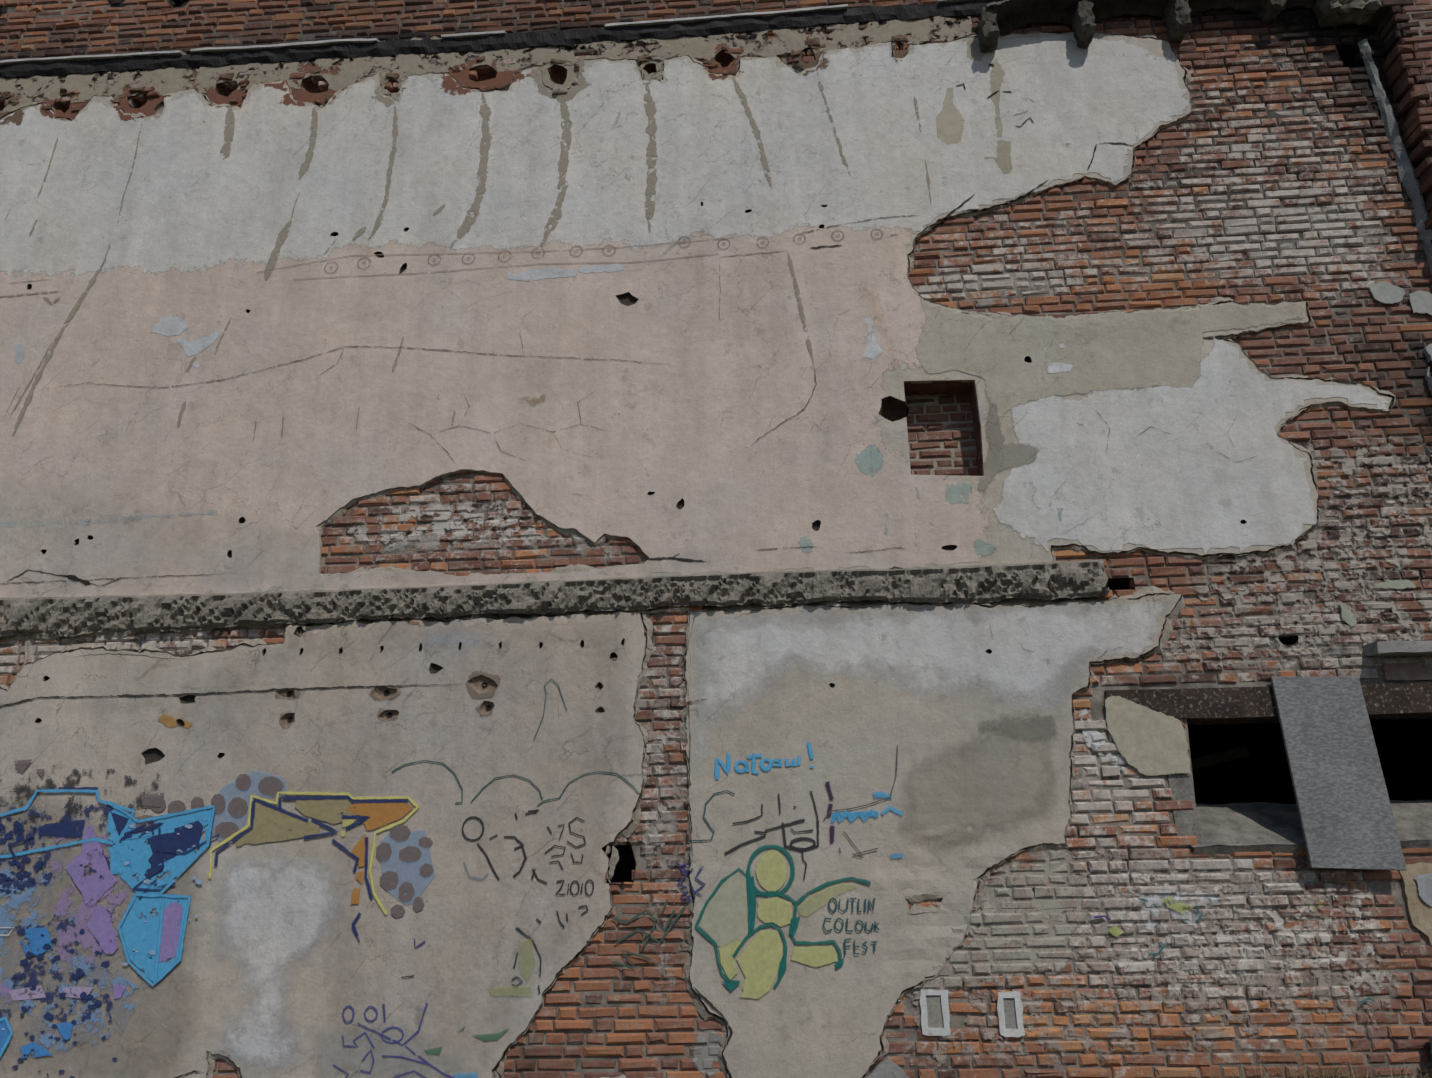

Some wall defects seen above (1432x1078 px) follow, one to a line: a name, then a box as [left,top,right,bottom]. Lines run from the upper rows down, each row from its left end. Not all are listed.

leakage [370,76,408,238]
flaking render [0,0,1013,174]
leakage [440,56,591,247]
leakage [637,61,664,232]
leakage [704,43,772,186]
leakage [793,45,850,174]
spalling [615,292,639,306]
crack [67,337,657,463]
crack [755,372,817,442]
flaking render [317,470,649,577]
peeling [863,7,1432,1078]
spalling [0,601,896,1078]